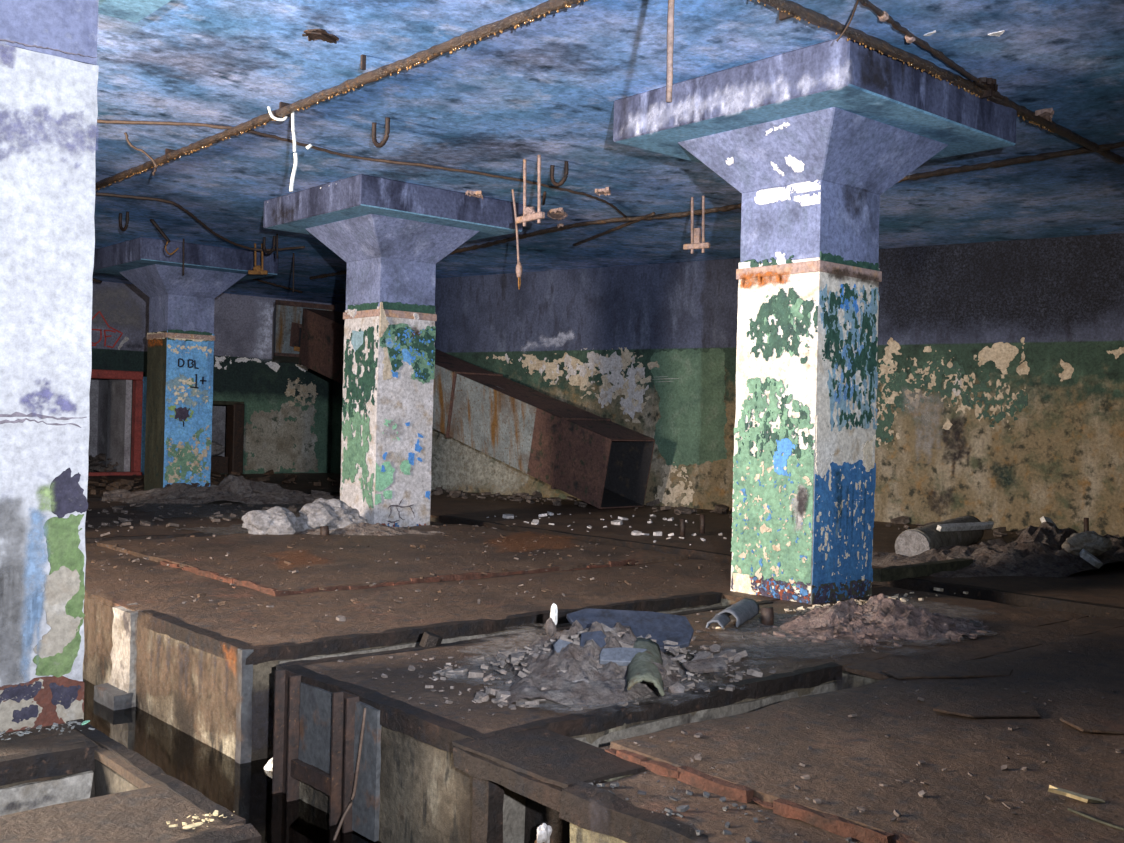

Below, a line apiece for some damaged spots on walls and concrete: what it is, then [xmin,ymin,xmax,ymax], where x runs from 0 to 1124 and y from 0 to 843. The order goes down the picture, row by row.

corrosion [740,271,788,288]
peeling [739,252,794,269]
peeling [820,251,879,271]
corrosion [828,269,879,286]
peeling [147,329,318,487]
peeling [341,301,436,508]
corrosion [527,408,655,509]
leakage [907,395,970,473]
peeling [1059,359,1074,381]
peeling [0,468,95,740]